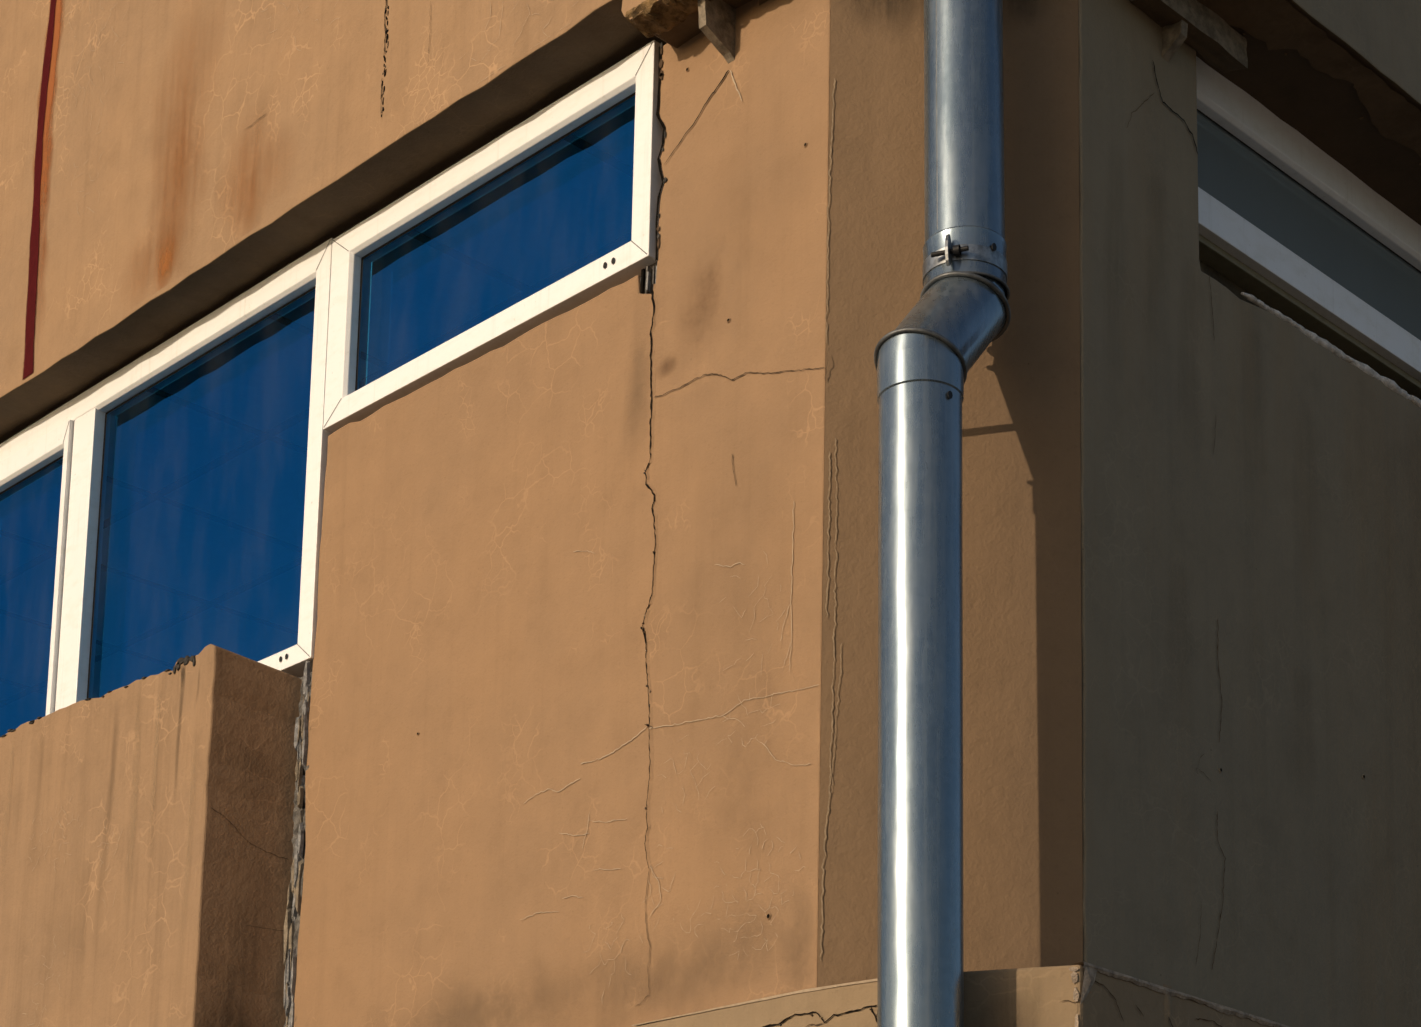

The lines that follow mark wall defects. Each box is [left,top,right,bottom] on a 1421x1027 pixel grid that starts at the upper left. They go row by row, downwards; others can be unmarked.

corrosion [22,0,62,380]
spalling [625,0,711,294]
crack [665,70,742,163]
spalling [1130,0,1248,74]
crack [520,284,828,1006]
crack [756,1002,877,1027]